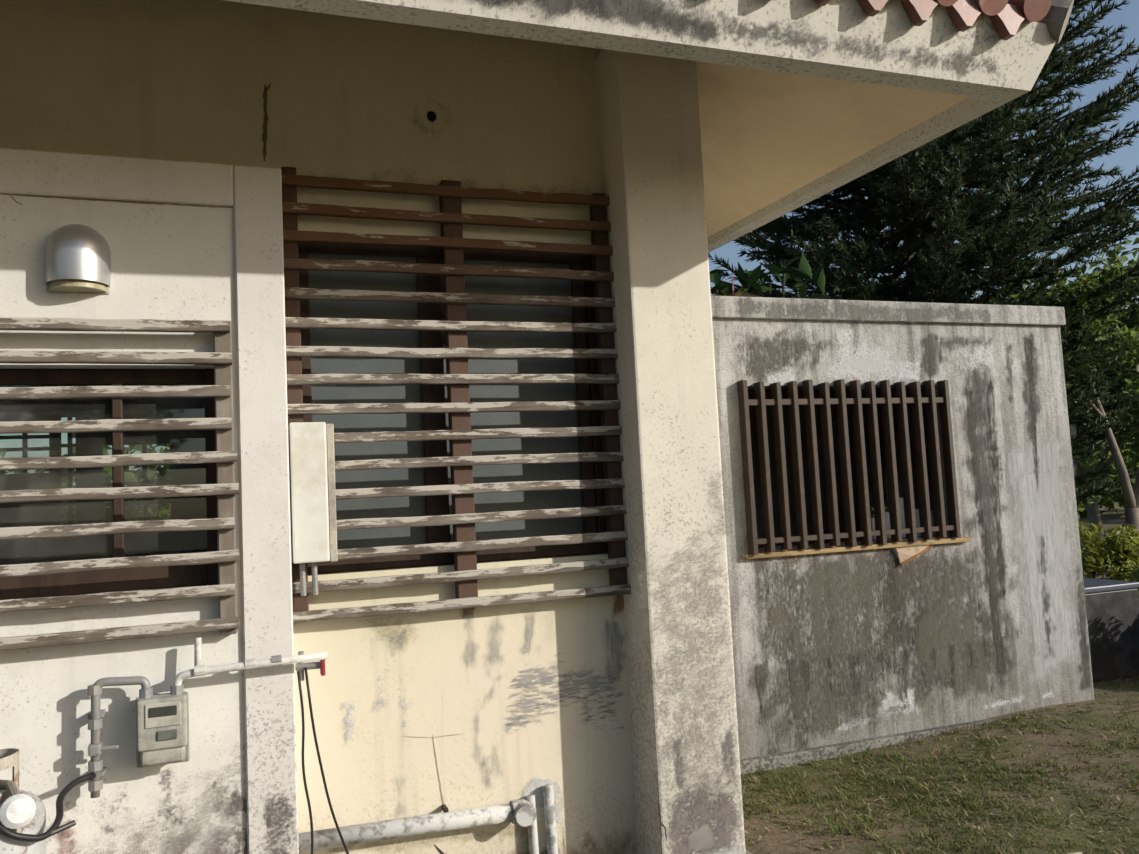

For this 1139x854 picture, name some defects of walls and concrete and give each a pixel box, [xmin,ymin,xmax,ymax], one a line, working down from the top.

leakage [477,0,997,75]
crack [262,83,271,161]
leakage [736,298,991,382]
leakage [1007,334,1040,487]
leakage [749,370,1022,754]
leakage [506,622,622,728]
leakage [649,478,739,854]
leakage [1042,587,1054,654]
leakage [1077,568,1091,689]
leakage [96,770,248,854]
leakage [264,794,293,854]